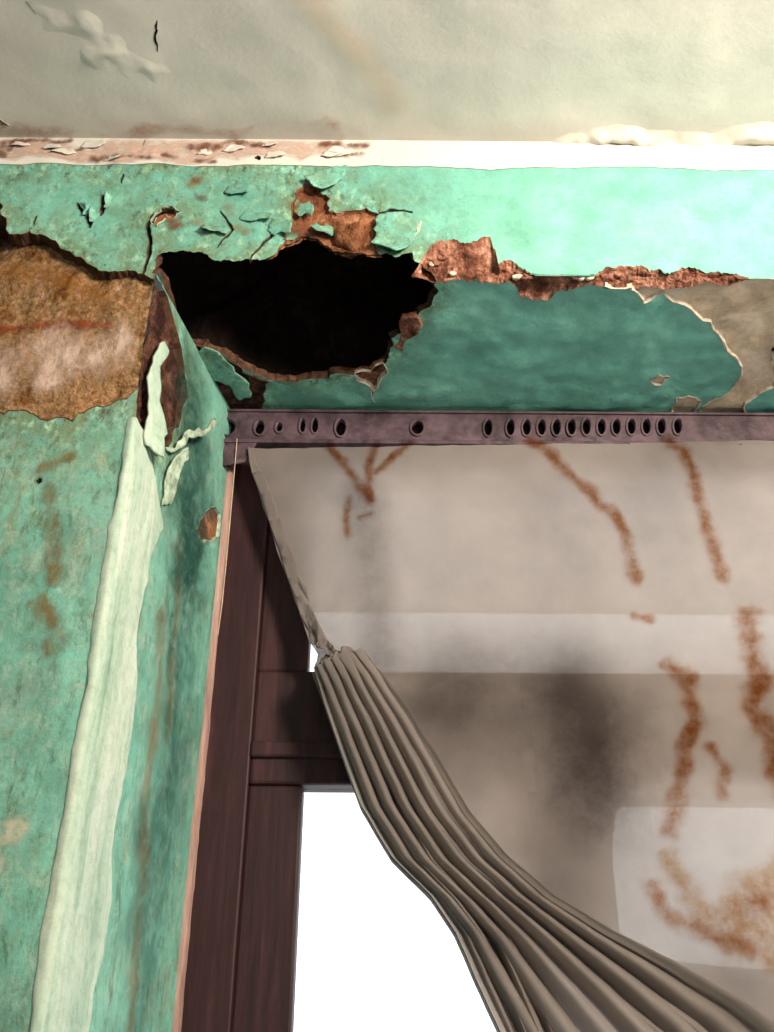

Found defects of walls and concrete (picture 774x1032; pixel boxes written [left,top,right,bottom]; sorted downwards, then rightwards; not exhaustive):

crack [142,205,181,274]
crack [217,210,235,248]
crack [249,234,274,264]
spalling [0,118,774,506]